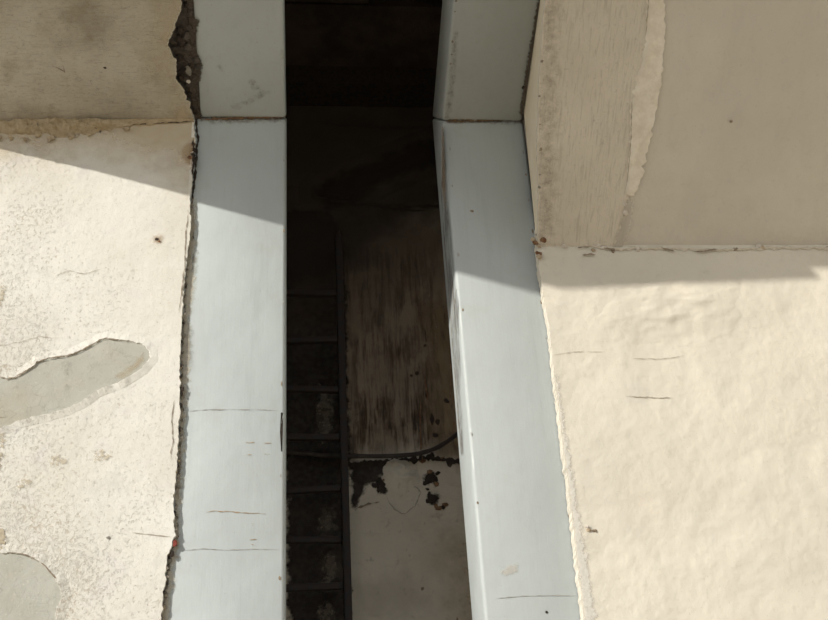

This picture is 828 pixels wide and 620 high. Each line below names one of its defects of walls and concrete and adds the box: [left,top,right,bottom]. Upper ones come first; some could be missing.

spalling [169,0,203,120]
peeling [0,331,158,466]
crack [132,118,200,620]
spalling [310,452,460,510]
peeling [0,526,71,620]